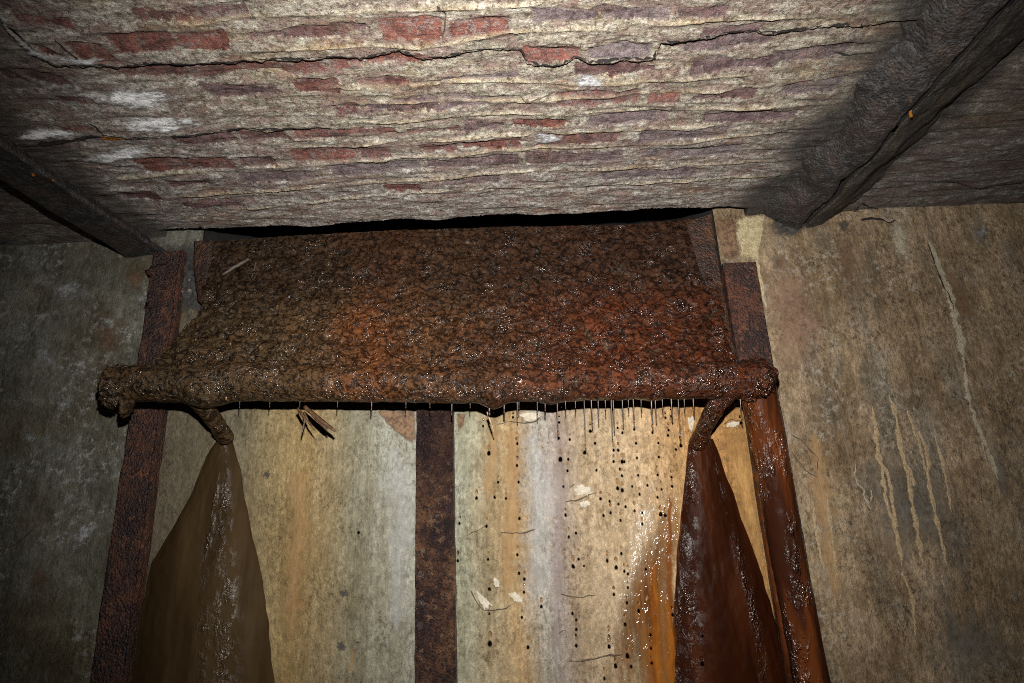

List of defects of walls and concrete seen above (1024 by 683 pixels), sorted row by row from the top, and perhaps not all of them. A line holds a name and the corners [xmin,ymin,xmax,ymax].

crack [14,6,863,68]
crack [927,242,955,313]
damp [620,497,676,683]
corrosion [673,439,785,683]
damp [854,395,952,635]